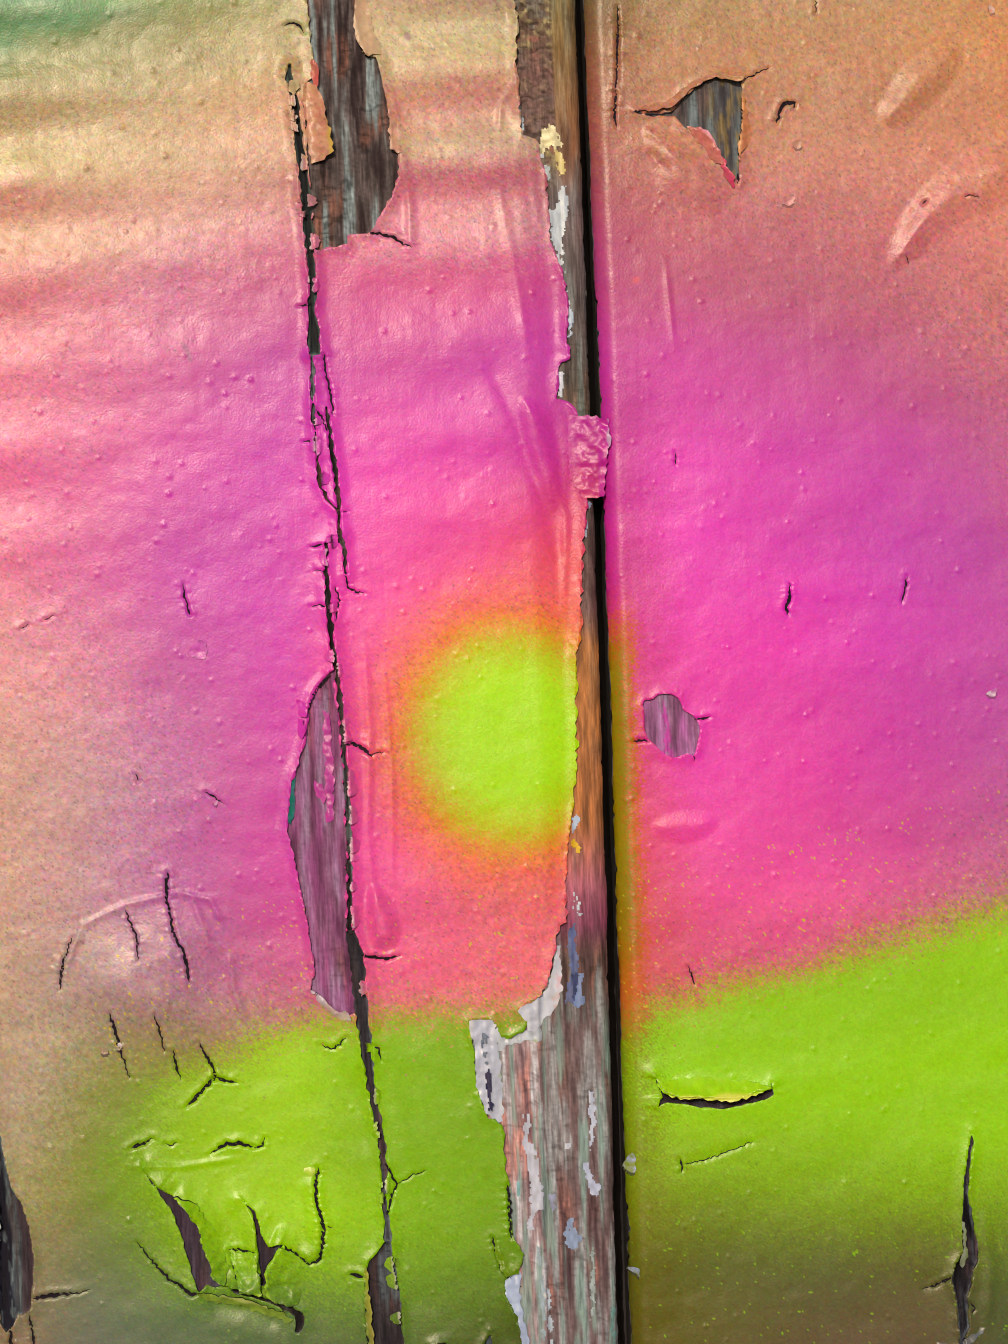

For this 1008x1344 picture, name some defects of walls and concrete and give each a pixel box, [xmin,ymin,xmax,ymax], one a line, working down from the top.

peeling [284,0,412,250]
peeling [635,68,768,189]
crack [285,65,425,1344]
peeling [469,0,640,1344]
peeling [634,694,710,760]
crack [125,911,139,959]
crack [164,872,190,981]
peeling [287,670,355,1021]
crack [154,1016,237,1107]
crack [0,1136,90,1344]
peeling [136,1166,332,1333]
crack [923,1136,985,1344]